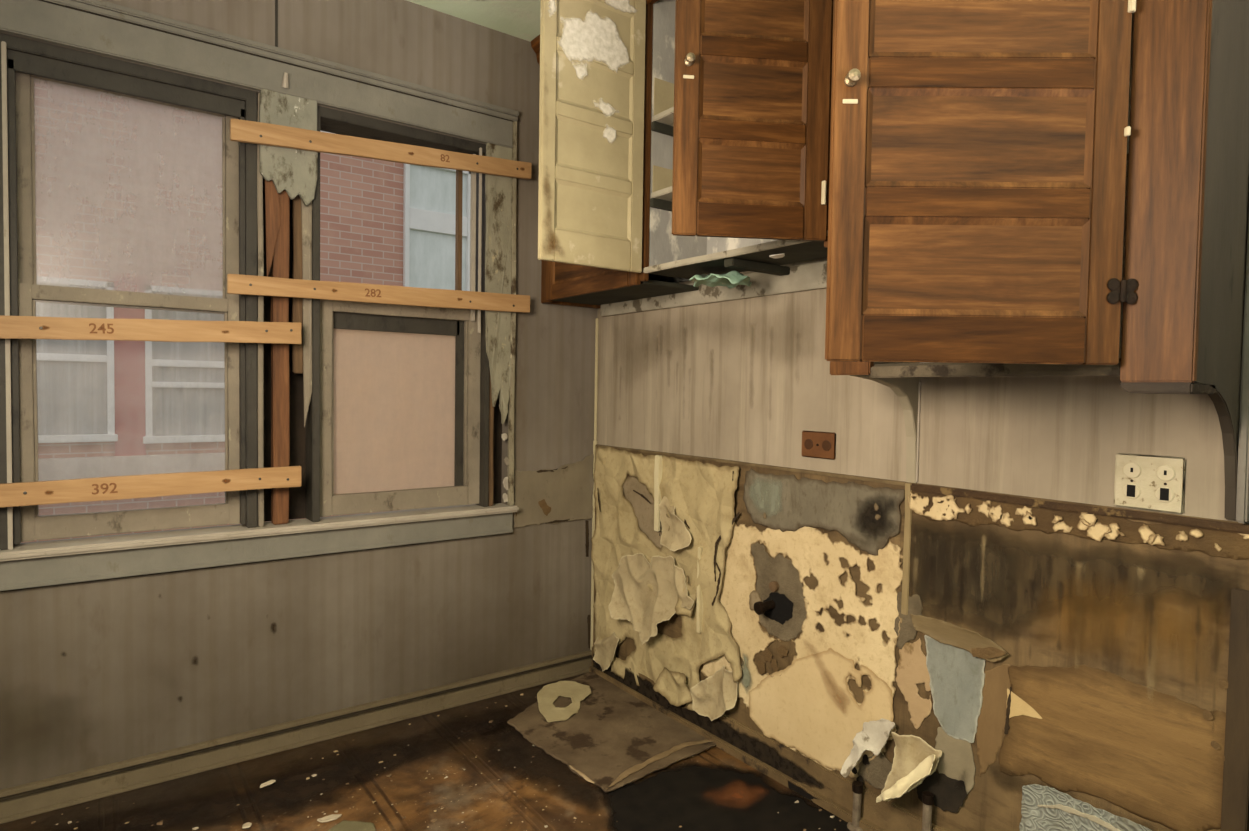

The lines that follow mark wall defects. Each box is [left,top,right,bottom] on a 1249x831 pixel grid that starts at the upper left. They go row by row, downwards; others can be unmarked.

peeling [701,468,1249,813]
damp [909,523,1234,633]
damp [65,654,850,831]